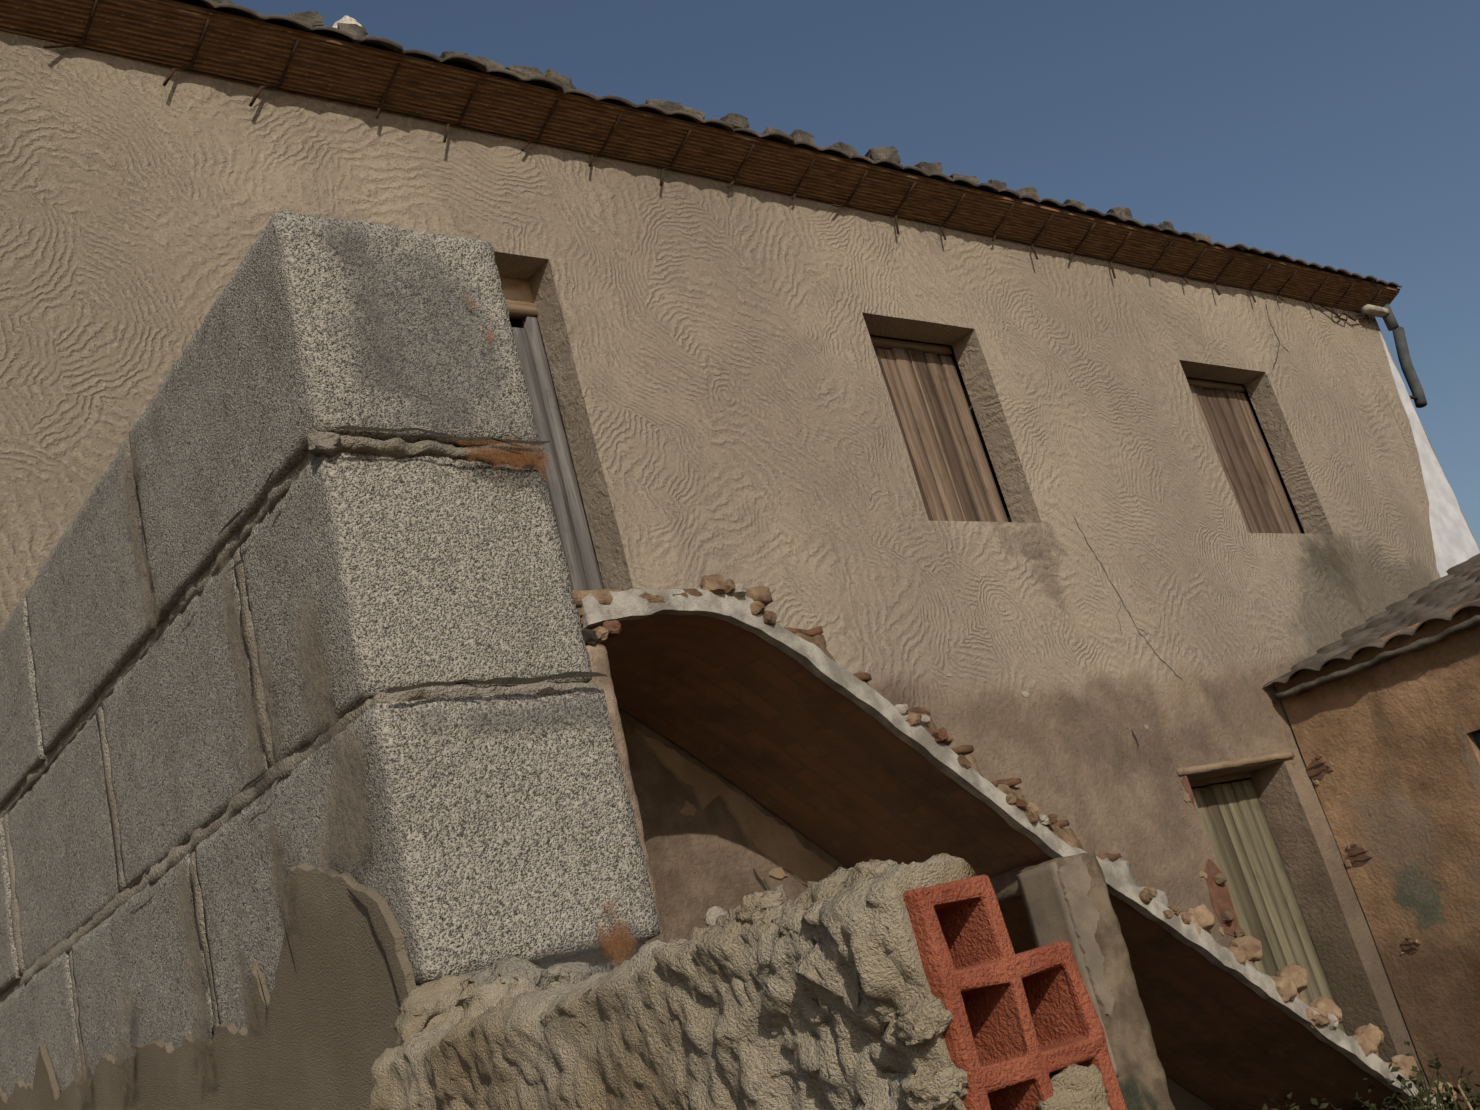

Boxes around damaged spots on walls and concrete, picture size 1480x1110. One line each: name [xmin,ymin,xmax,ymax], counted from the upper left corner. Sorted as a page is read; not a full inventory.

spalling [699,574,777,625]
crack [1073,515,1183,681]
spalling [895,704,973,768]
peeling [635,729,835,887]
spalling [1006,794,1057,826]